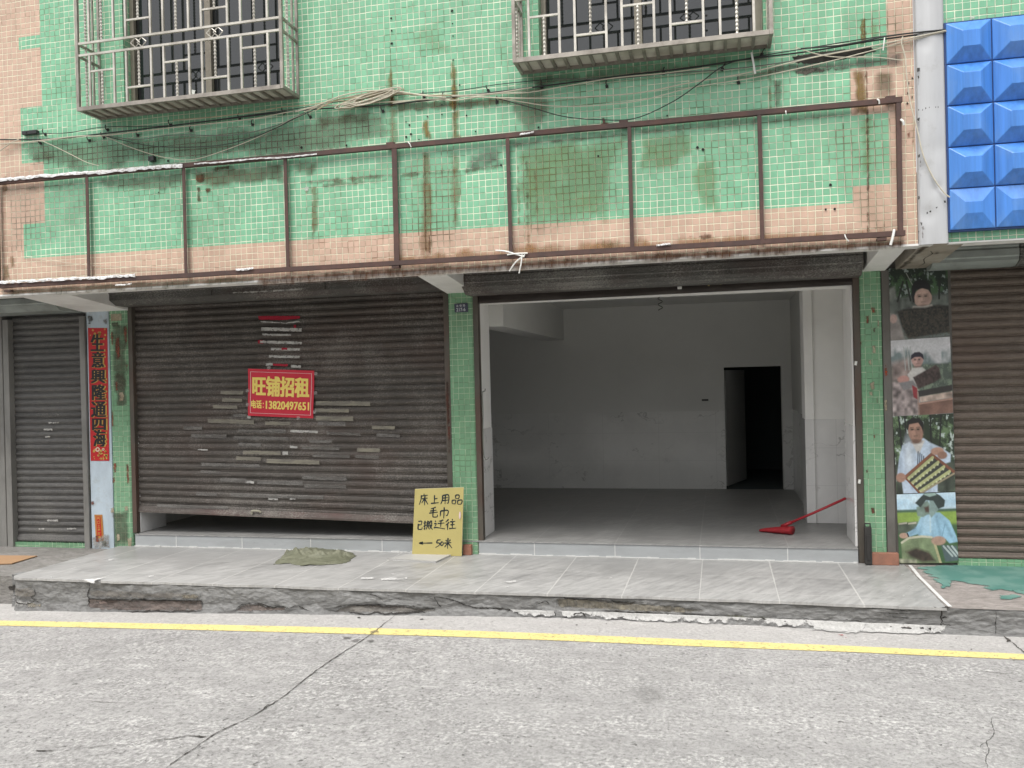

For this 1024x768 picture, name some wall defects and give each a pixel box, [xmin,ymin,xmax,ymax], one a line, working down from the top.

corrosion [450,68,460,138]
corrosion [855,72,890,150]
water stain [522,140,616,231]
corrosion [261,158,902,285]
corrosion [13,281,189,295]
spalling [82,577,203,613]
spalling [235,603,434,615]
spalling [557,597,704,616]